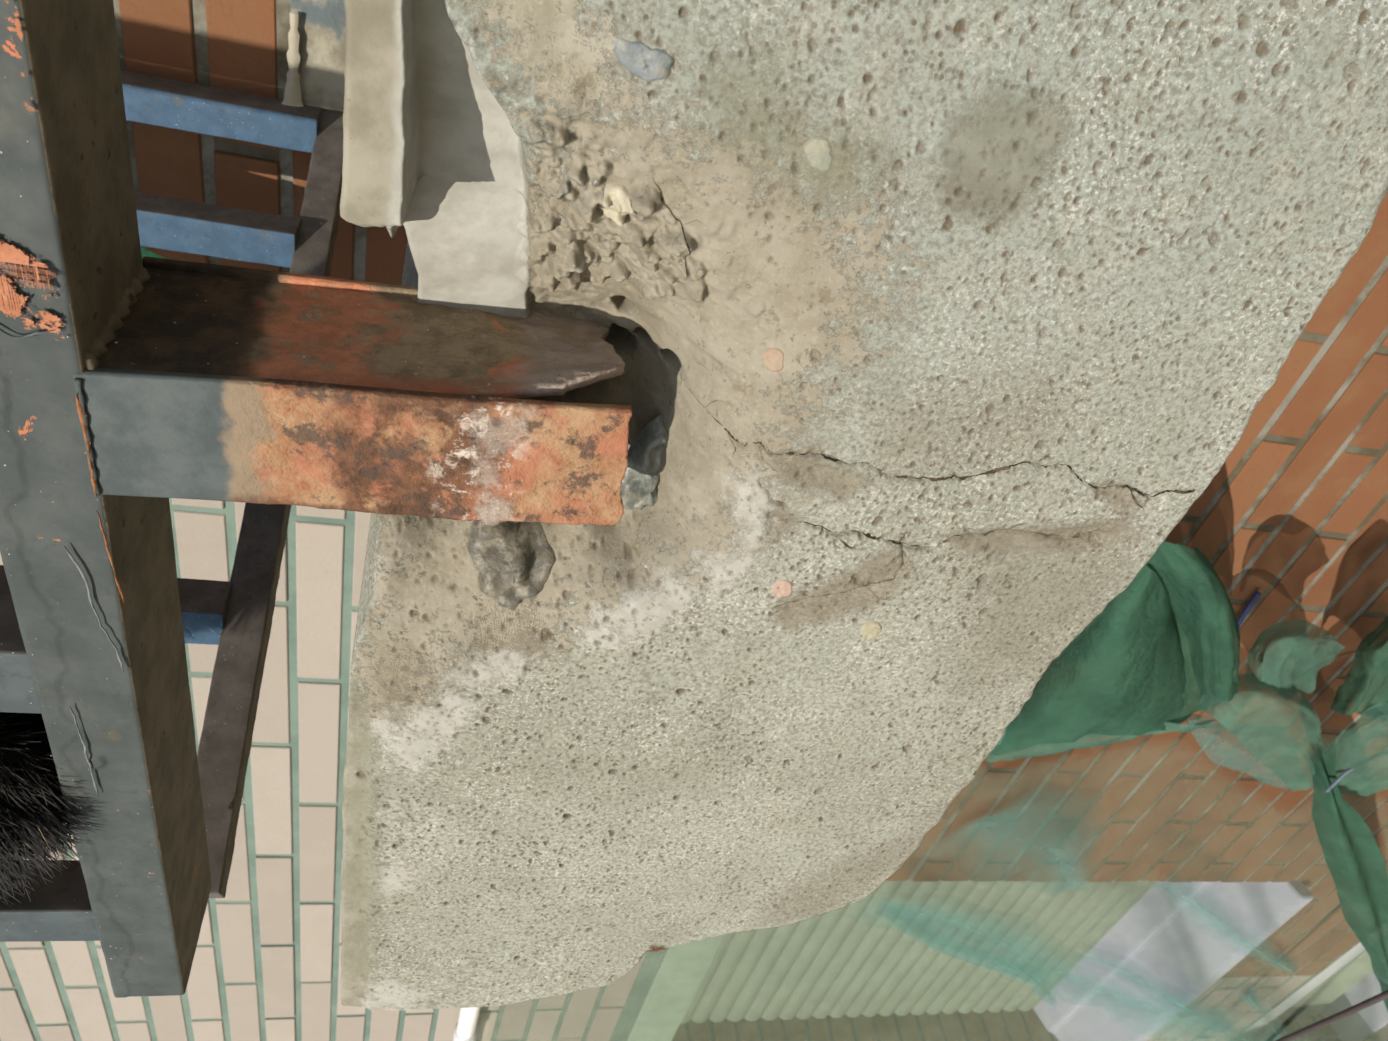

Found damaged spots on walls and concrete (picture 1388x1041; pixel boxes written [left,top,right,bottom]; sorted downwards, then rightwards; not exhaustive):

damp [946,92,1067,209]
peeling [0,239,65,339]
spalling [350,0,935,740]
corrosion [76,393,125,603]
damp [705,481,769,597]
crack [667,348,1202,608]
damp [587,569,691,649]
damp [373,651,523,770]